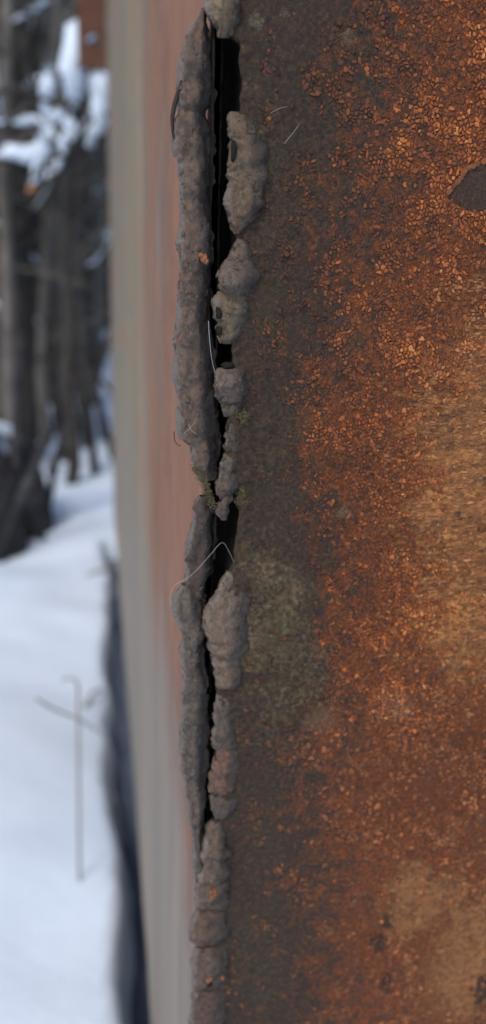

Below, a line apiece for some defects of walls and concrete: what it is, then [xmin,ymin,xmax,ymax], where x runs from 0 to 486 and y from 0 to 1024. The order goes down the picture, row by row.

crack [214,38,242,294]
rust [155,0,210,713]
crack [214,320,232,369]
crack [208,402,239,602]
rust [206,0,486,1024]
crack [204,649,217,823]